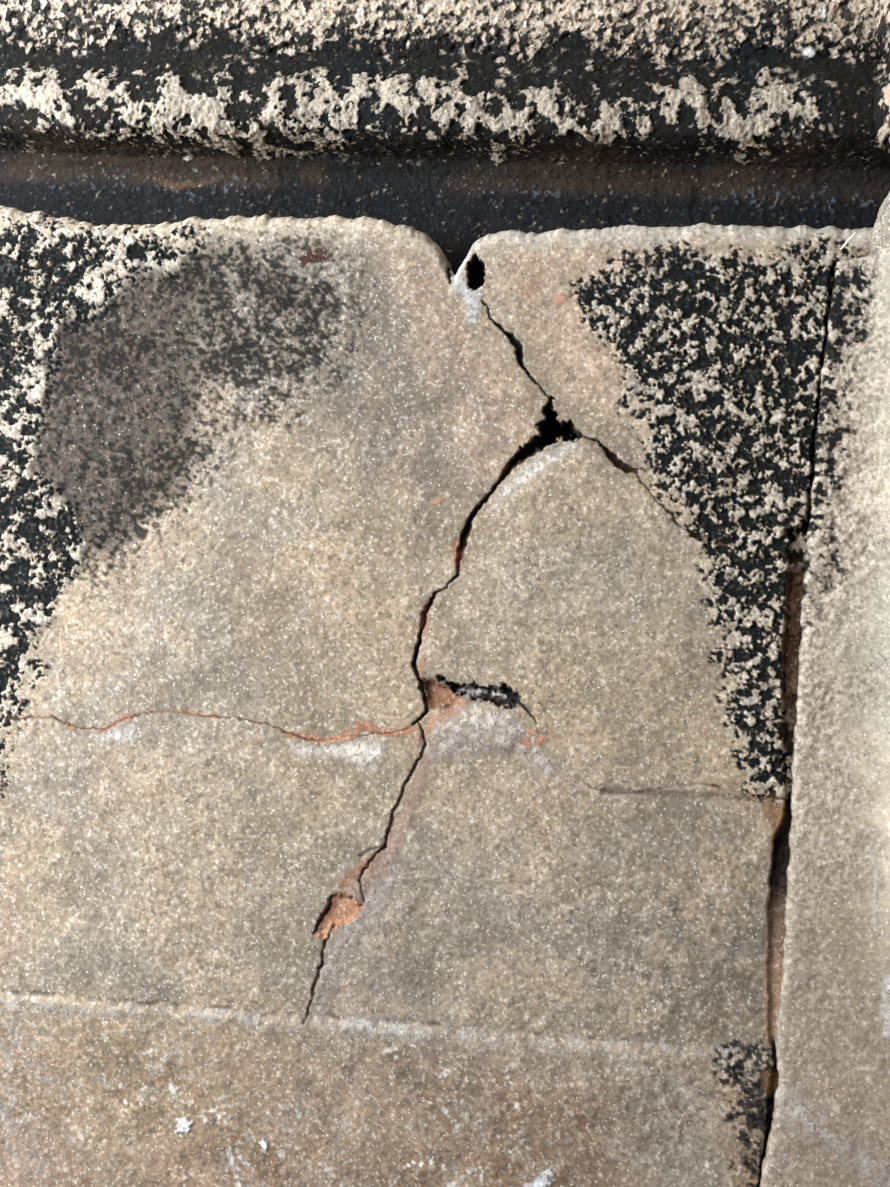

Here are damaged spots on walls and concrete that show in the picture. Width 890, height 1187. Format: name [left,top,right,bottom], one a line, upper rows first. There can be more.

crack [2,711,152,734]
damp [0,212,210,798]
crack [303,896,335,1024]
spalling [312,675,557,1023]
crack [196,214,835,902]
crack [757,1041,777,1187]